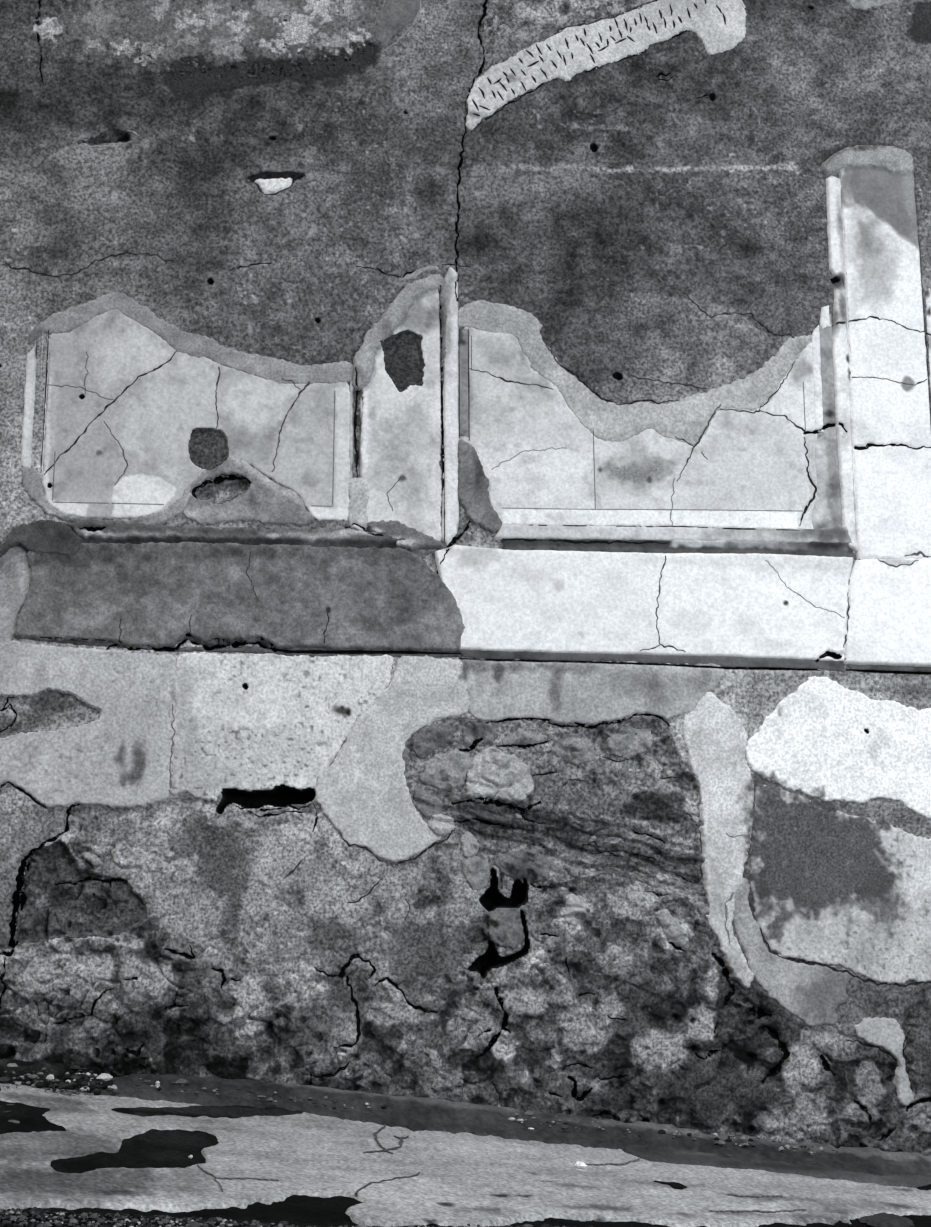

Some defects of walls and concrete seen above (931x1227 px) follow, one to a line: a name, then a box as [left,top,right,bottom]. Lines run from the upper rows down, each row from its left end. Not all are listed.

water stain [24,0,379,107]
flaking render [254,178,292,194]
crack [442,0,544,301]
crack [44,351,177,485]
crack [192,378,310,499]
spalling [380,330,425,392]
crack [470,292,931,526]
crack [765,551,931,662]
spalling [0,689,101,738]
spalling [16,840,147,944]
spalling [402,715,709,950]
water stain [746,772,903,942]